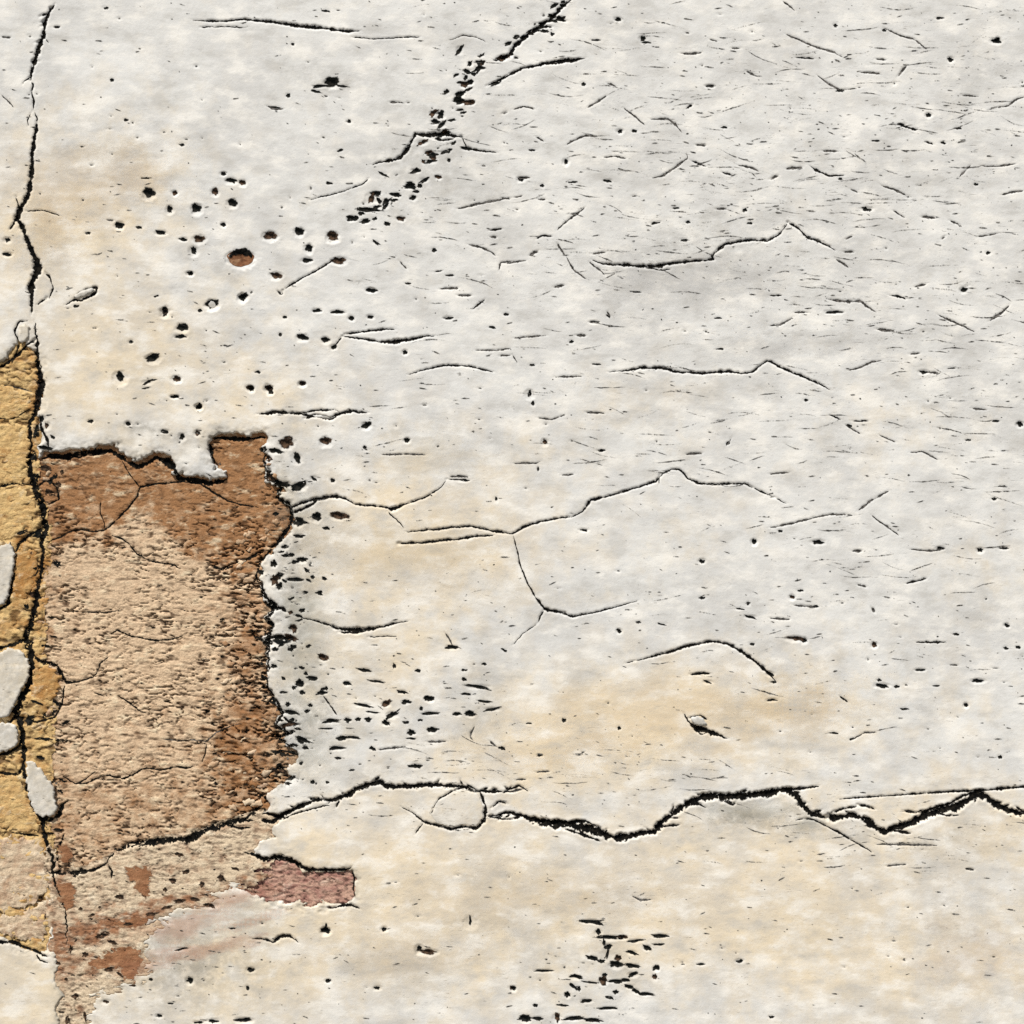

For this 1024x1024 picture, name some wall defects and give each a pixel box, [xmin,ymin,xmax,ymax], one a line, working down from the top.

crack [195,18,417,39]
crack [449,0,584,84]
crack [10,5,60,313]
crack [311,132,496,200]
crack [458,177,545,209]
crack [469,208,853,288]
crack [0,320,1024,943]
spalling [0,324,357,1024]